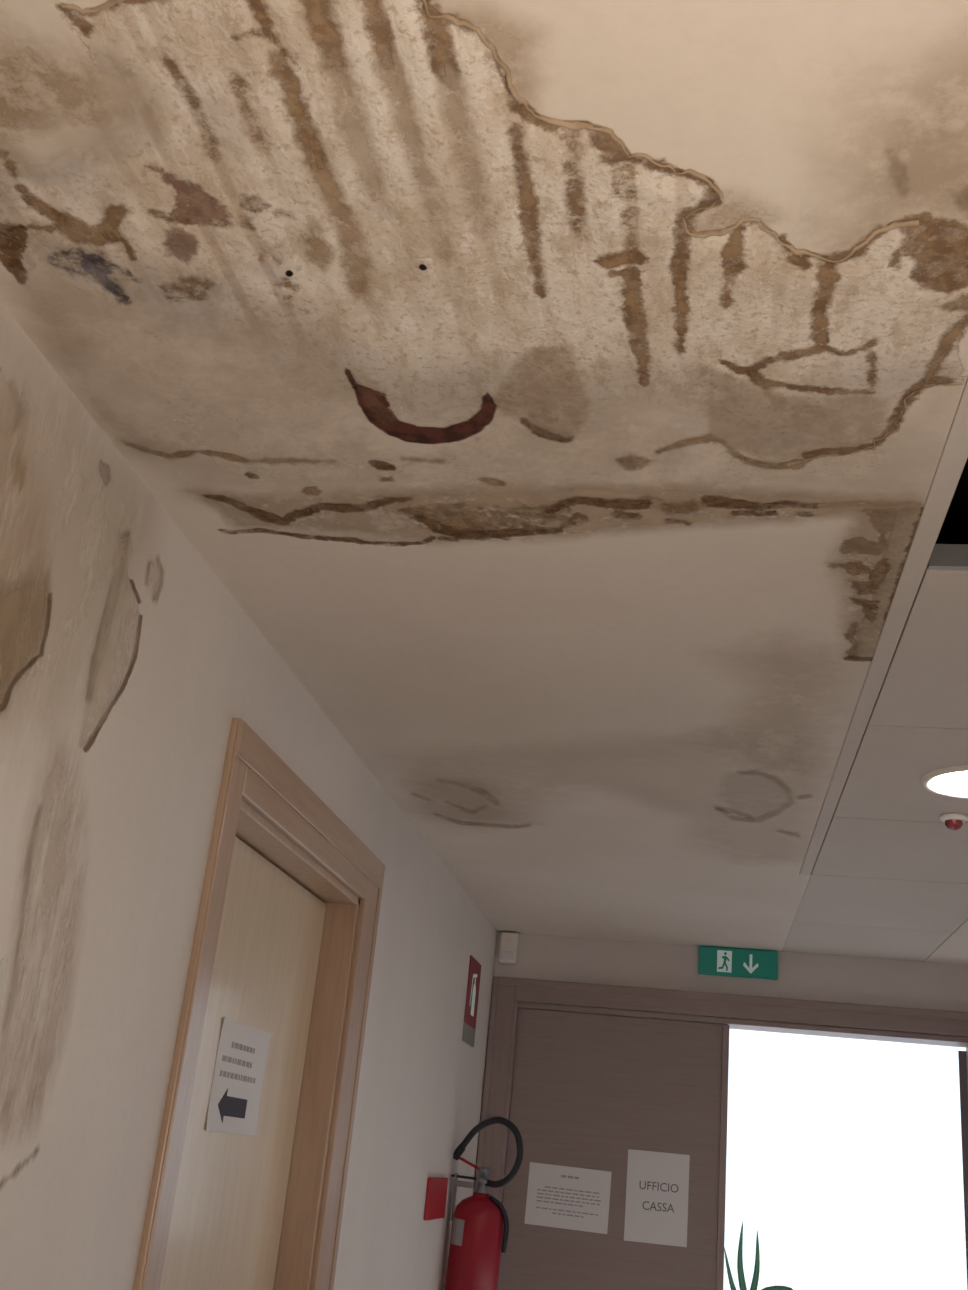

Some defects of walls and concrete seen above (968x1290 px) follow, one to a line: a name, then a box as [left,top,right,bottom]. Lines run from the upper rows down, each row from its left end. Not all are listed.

damp [0,48,102,128]
peeling [0,0,968,469]
mould [50,248,138,305]
rust [345,369,497,444]
damp [522,418,573,443]
peeling [205,490,923,661]
damp [0,586,52,712]